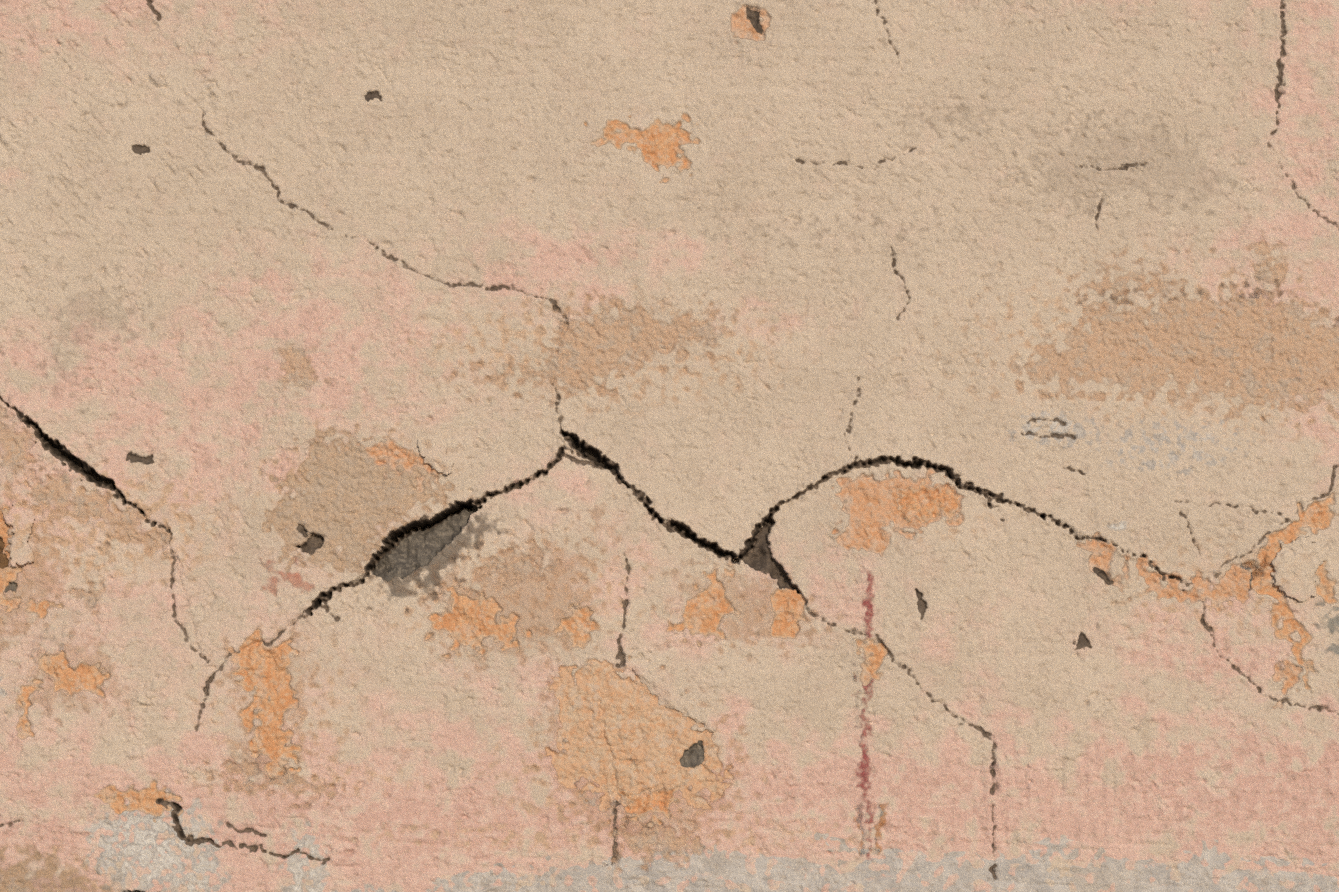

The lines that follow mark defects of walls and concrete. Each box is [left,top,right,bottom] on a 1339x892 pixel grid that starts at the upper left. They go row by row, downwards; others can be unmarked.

peeling [591,113,700,183]
crack [1268,0,1287,146]
crack [370,243,569,324]
crack [0,397,232,732]
peeling [262,424,454,573]
crack [263,377,1339,715]
spalling [831,468,965,558]
spalling [1077,492,1339,709]
crack [156,798,330,865]
spalling [228,629,302,779]
spalling [533,603,737,830]
crack [876,634,997,880]